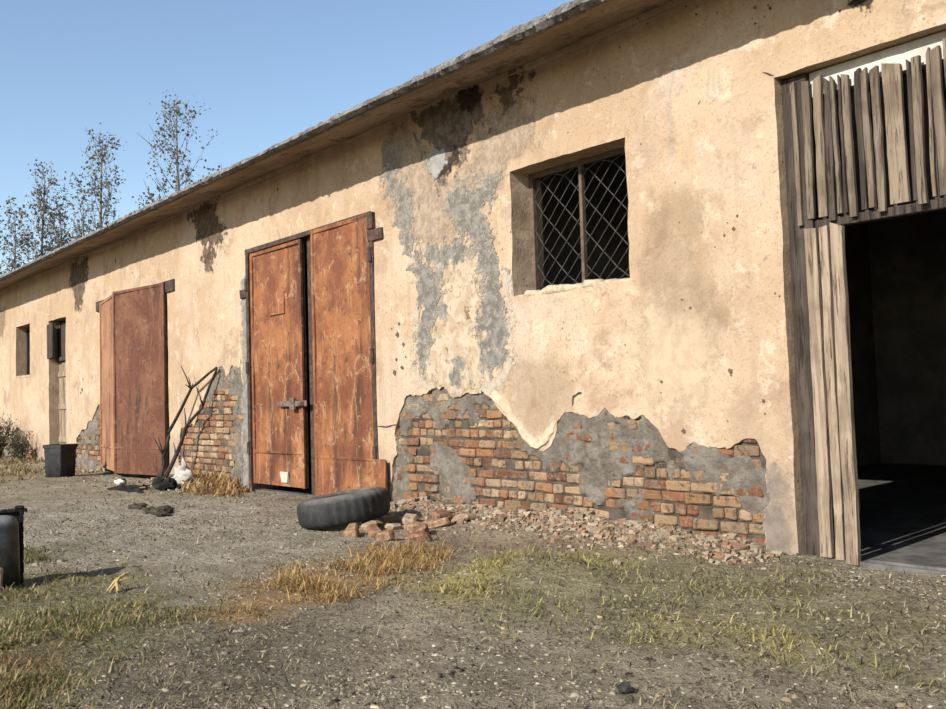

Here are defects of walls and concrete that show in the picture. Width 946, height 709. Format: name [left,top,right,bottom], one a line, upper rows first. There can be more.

spalling [838,0,873,16]
spalling [76,404,103,470]
spalling [180,276,249,489]
spalling [343,85,770,547]